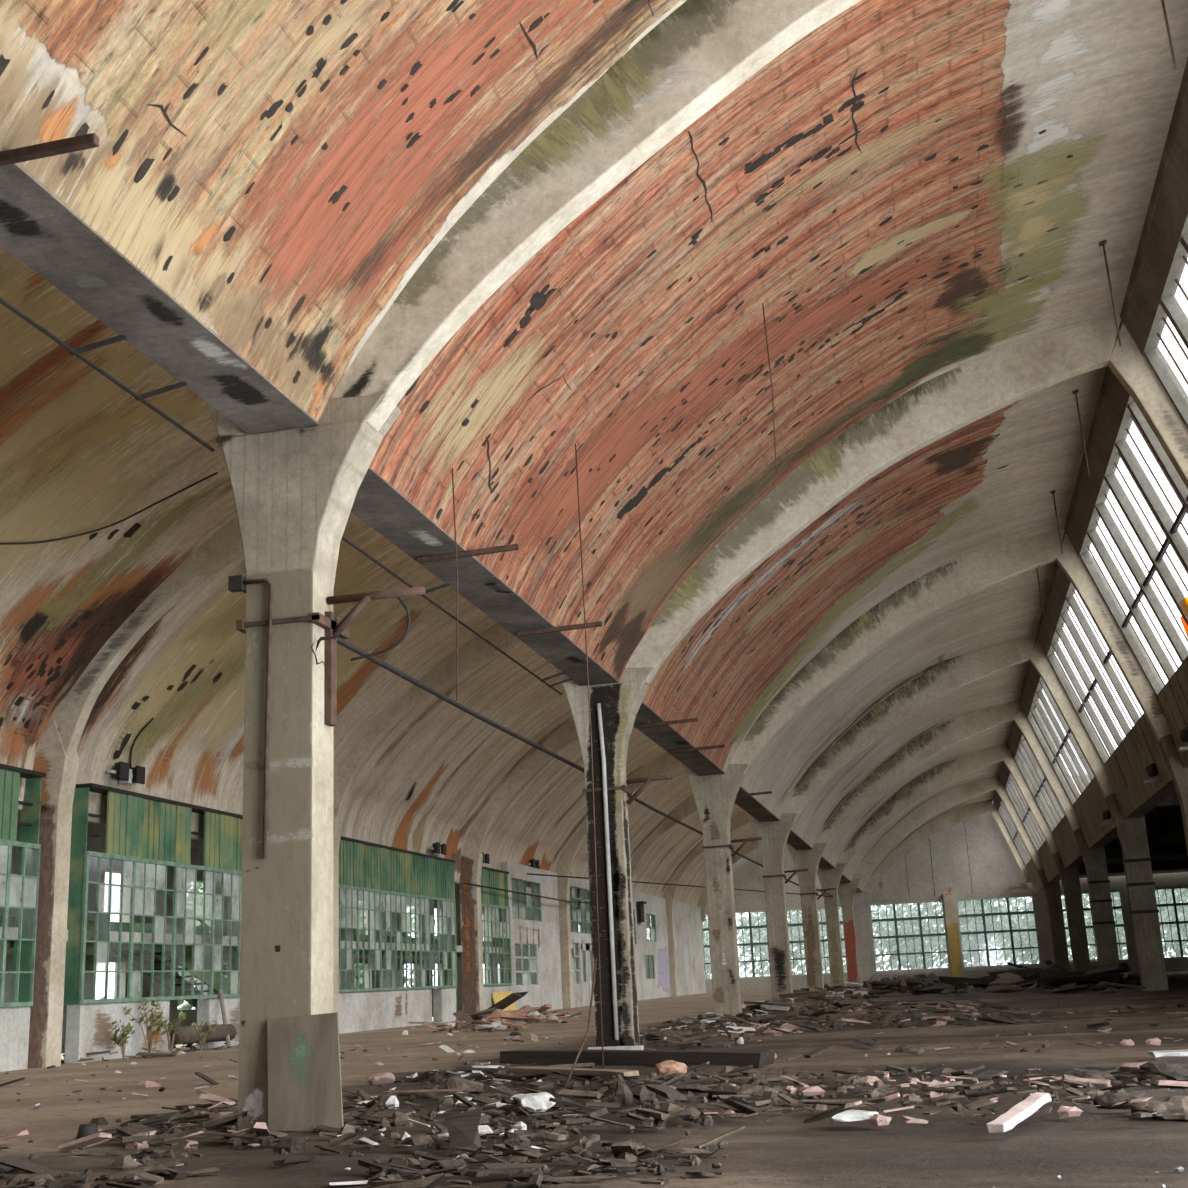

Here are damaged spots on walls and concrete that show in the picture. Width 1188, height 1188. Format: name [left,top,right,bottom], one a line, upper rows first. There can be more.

flaking render [0,0,678,425]
damp [393,0,739,305]
crack [688,131,712,220]
flaking render [369,0,1095,681]
crack [839,69,862,153]
damp [651,138,1100,626]
flaking render [642,400,1020,770]